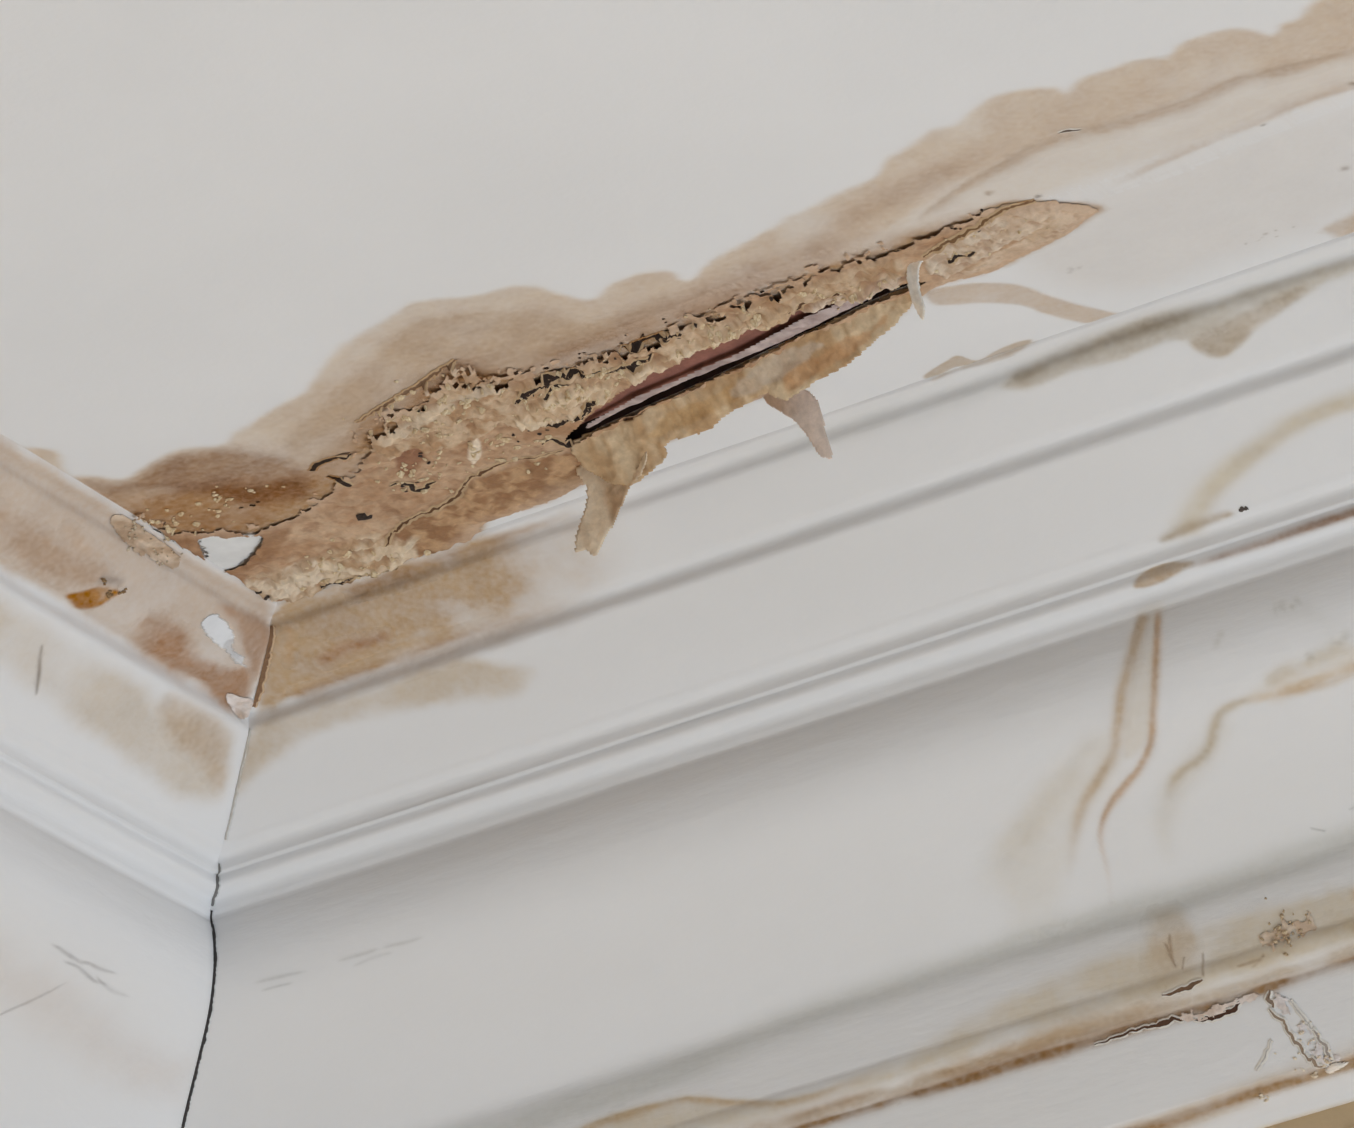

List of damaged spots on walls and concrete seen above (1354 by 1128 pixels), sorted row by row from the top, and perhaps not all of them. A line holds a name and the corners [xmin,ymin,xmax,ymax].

spalling [110,198,1099,603]
peeling [202,614,245,666]
crack [181,625,276,1128]
peeling [225,693,254,719]